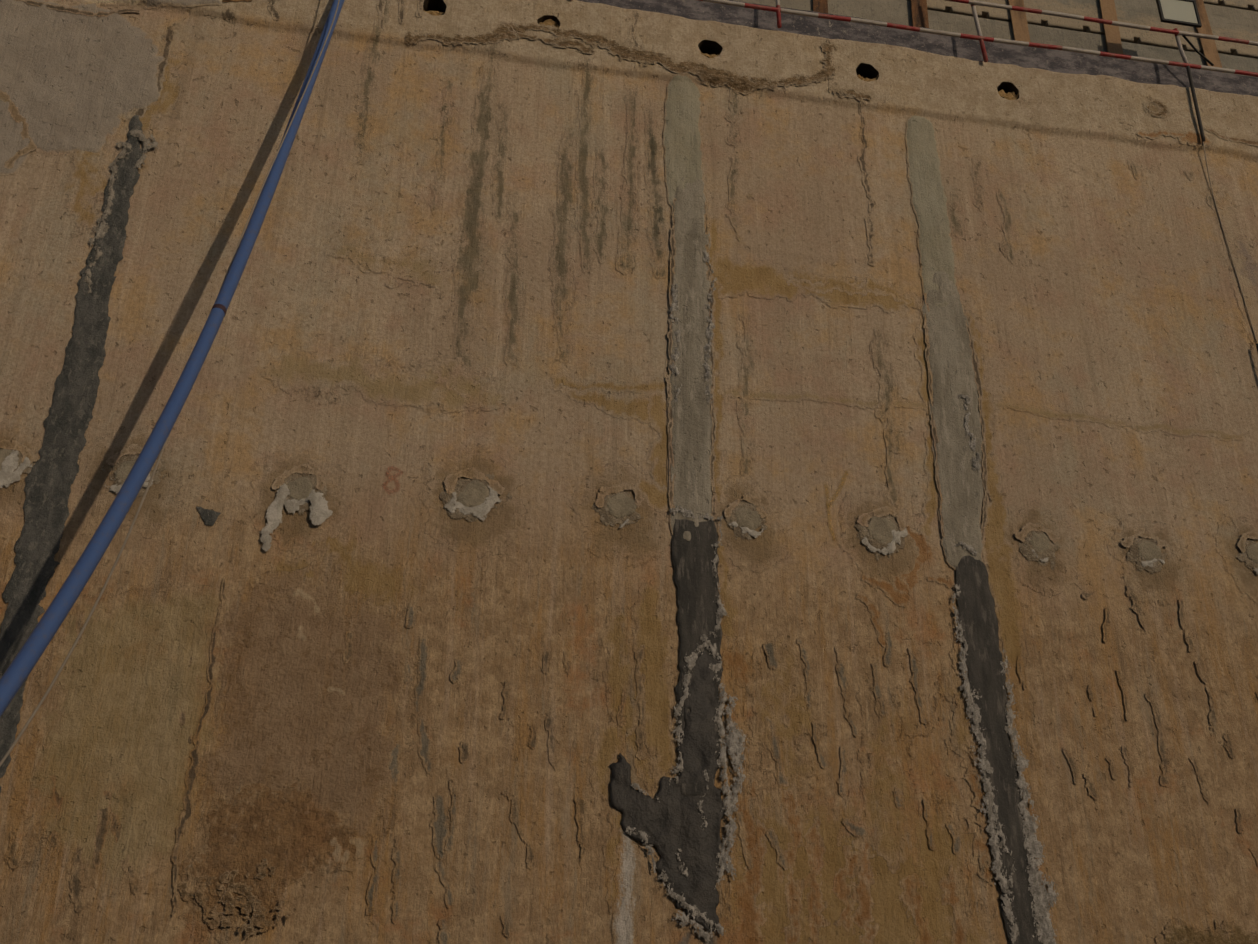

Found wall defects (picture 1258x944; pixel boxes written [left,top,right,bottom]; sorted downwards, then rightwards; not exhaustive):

damp [449,40,527,370]
damp [548,54,667,363]
efflorescence [609,823,640,944]